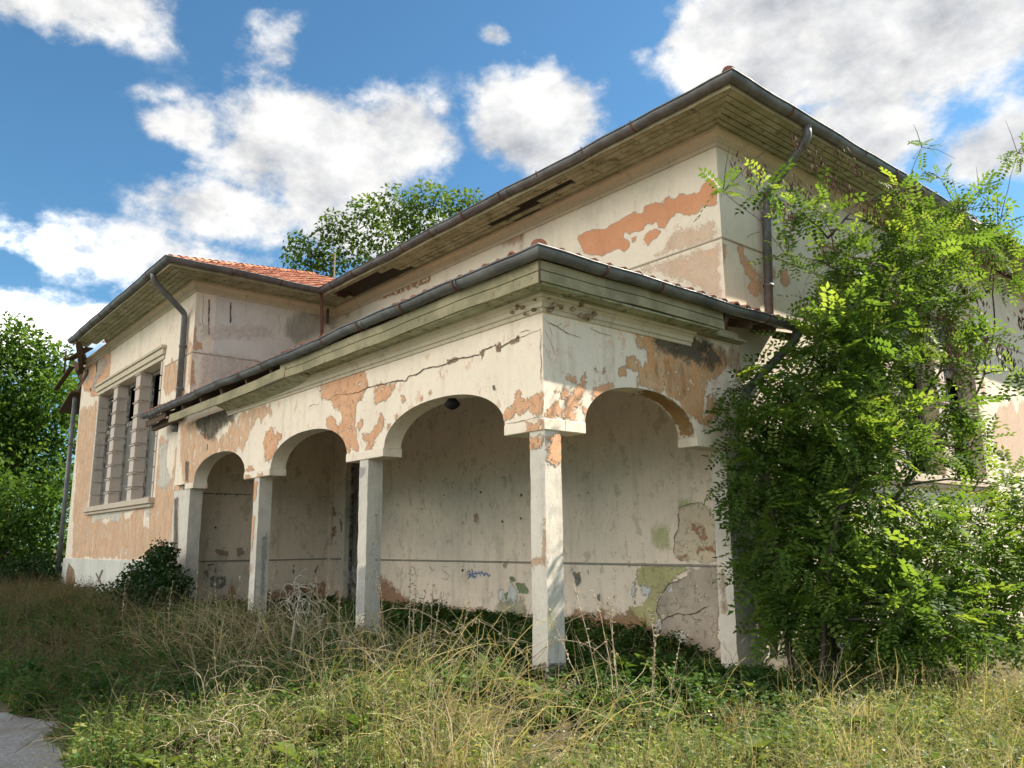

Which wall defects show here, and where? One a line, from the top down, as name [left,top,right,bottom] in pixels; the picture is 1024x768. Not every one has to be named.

peeling [577,178,790,297]
peeling [66,352,282,590]
peeling [319,371,406,454]
crack [310,321,610,406]
peeling [503,334,727,467]
water stain [655,336,741,374]
spalling [622,502,721,657]